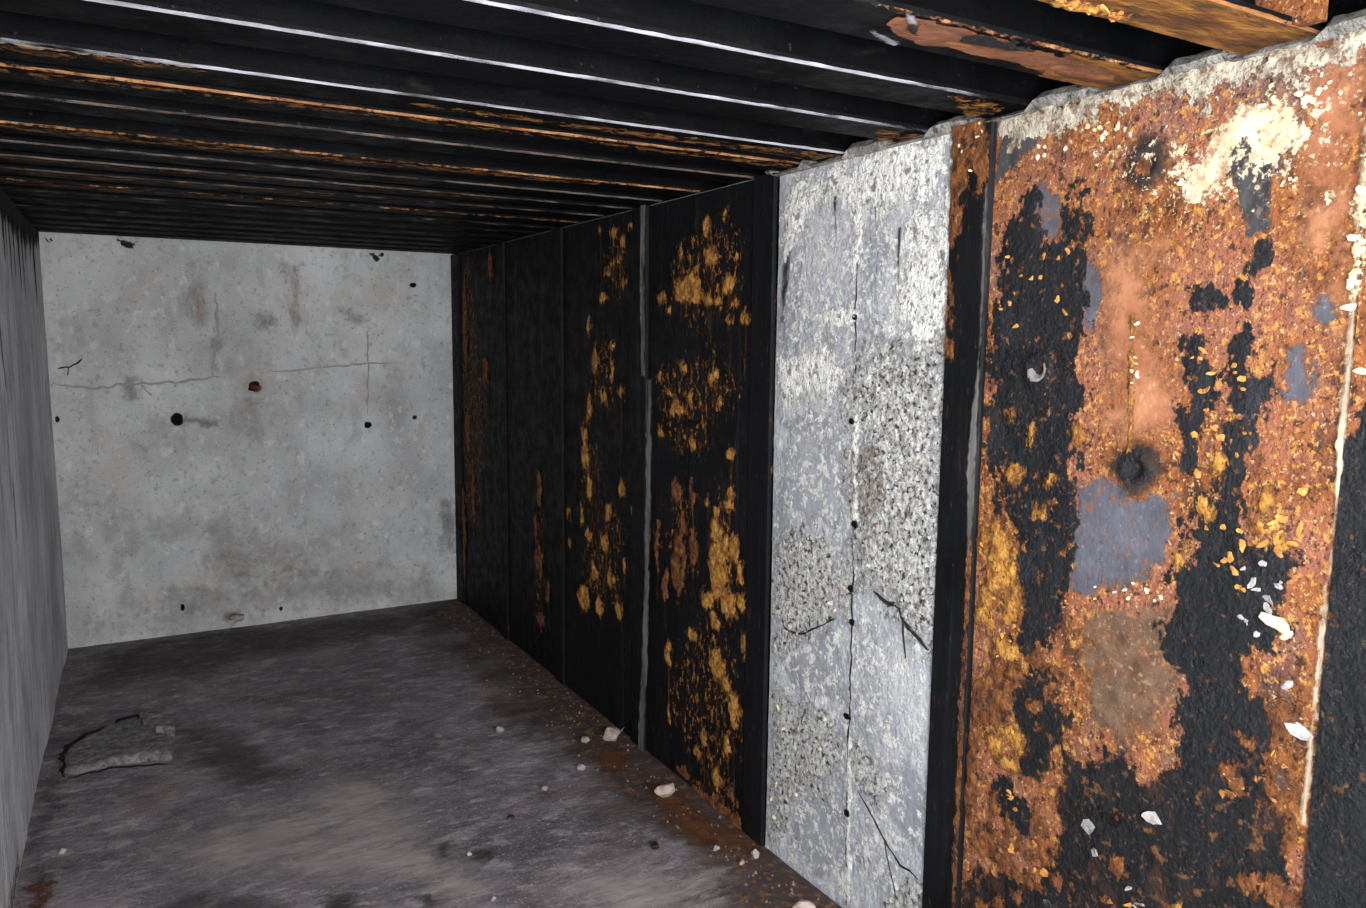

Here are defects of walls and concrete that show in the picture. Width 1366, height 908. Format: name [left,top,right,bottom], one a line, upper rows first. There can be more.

water stain [997,27,1366,237]
rust [1300,49,1366,249]
rust [566,221,633,621]
rust [647,206,759,860]
crack [785,264,933,906]
rust [1002,405,1037,489]
rust [1105,240,1177,454]
rust [1190,424,1231,525]
rust [1246,484,1304,558]
rust [1331,257,1359,503]
rust [951,514,1083,908]
rust [1213,604,1328,908]